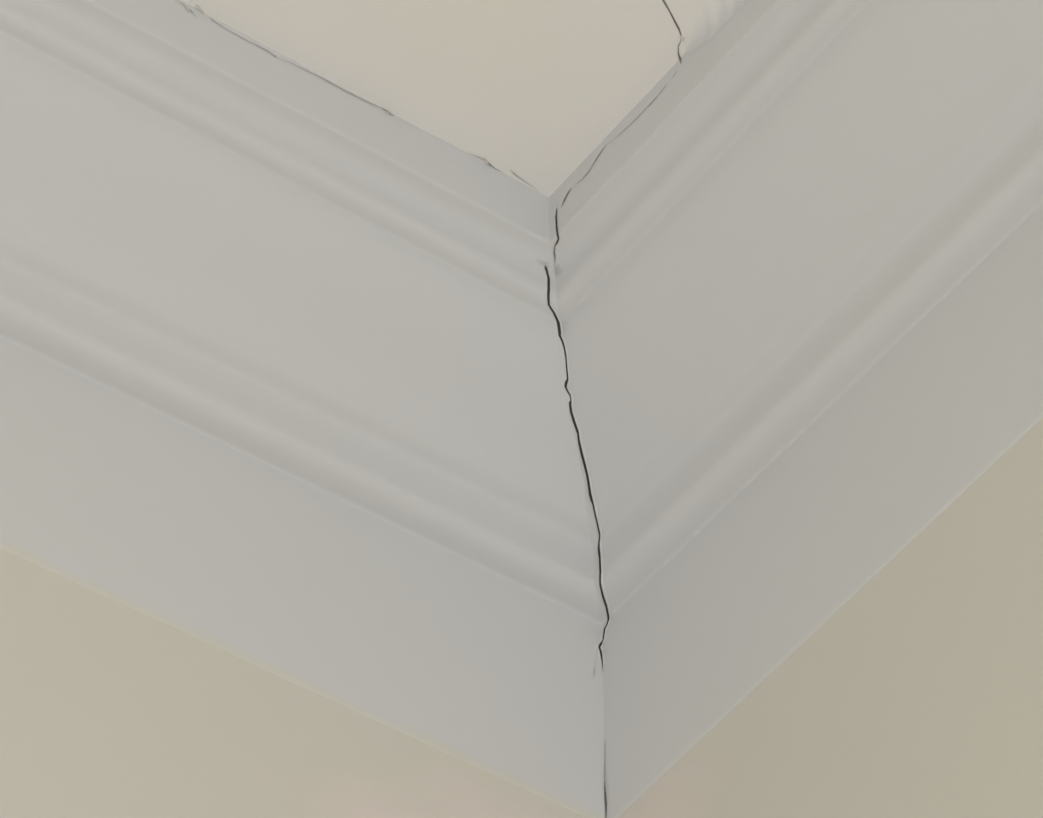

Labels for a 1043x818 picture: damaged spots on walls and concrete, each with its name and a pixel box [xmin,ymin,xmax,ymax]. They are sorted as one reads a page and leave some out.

crack [662,0,685,61]
crack [544,149,611,673]